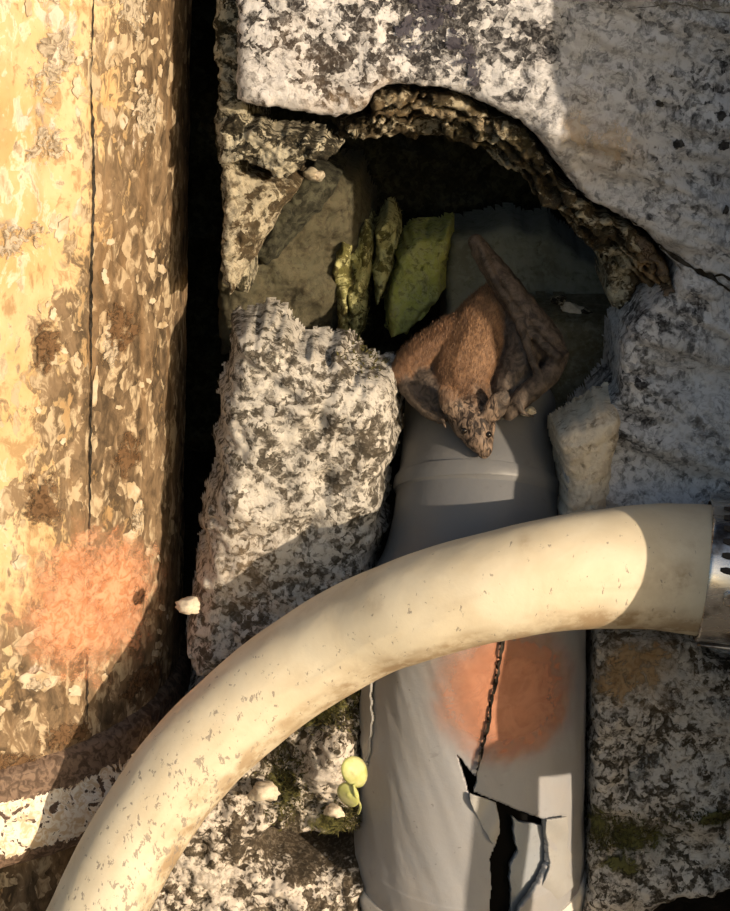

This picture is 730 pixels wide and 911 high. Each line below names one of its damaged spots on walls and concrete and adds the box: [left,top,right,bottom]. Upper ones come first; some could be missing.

spalling [270,84,675,310]
crack [551,159,590,202]
spalling [184,0,230,452]
crack [617,213,730,292]
spalling [363,282,440,355]
spalling [560,302,584,314]
spalling [395,428,404,456]
damp [700,811,730,826]
damp [599,854,640,876]